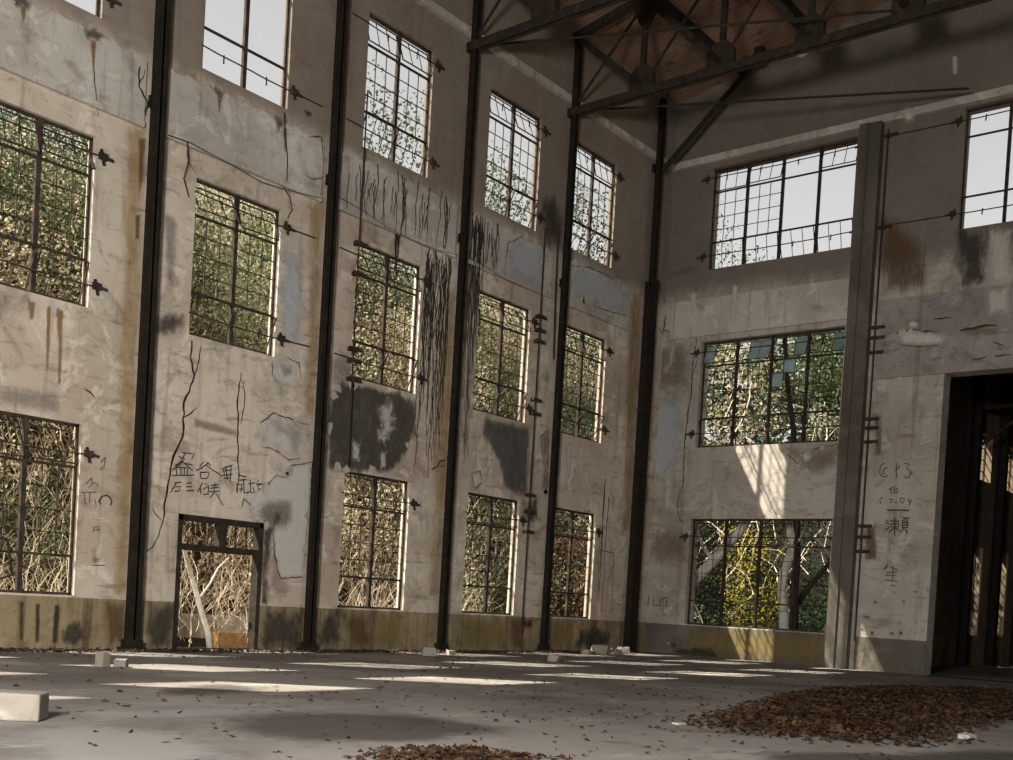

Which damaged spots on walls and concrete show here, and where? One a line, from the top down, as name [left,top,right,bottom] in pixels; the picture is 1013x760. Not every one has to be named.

water stain [959,229,1010,313]
corrosion [47,307,63,384]
crack [147,340,201,551]
crack [236,378,245,490]
water stain [326,381,415,476]
water stain [484,420,528,494]
water stain [318,611,339,645]